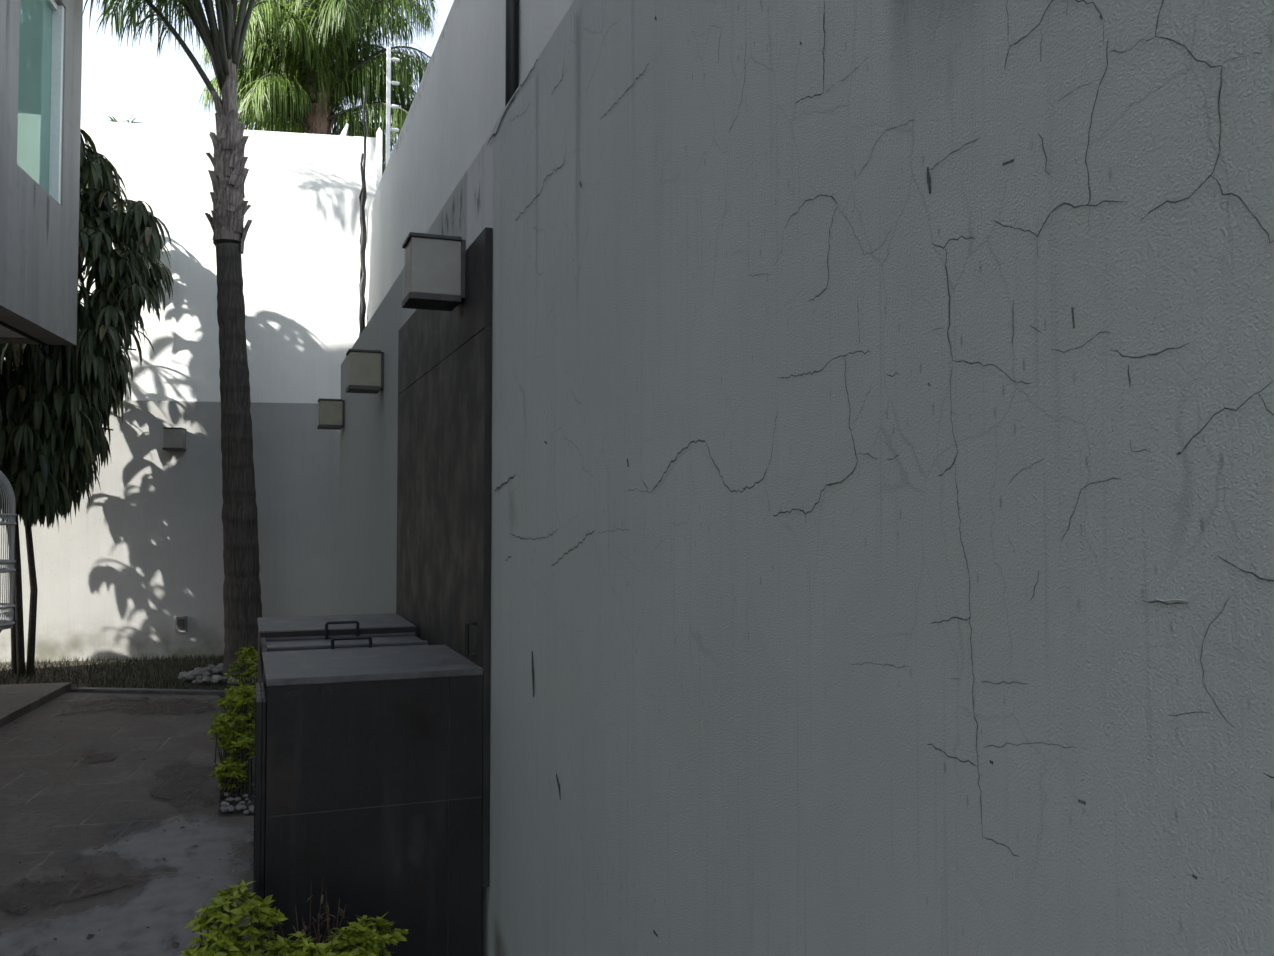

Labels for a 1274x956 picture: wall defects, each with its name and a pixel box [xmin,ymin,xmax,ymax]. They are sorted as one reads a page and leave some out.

crack [487,59,564,145]
crack [795,3,865,104]
crack [754,120,913,301]
crack [643,303,898,520]
crack [927,0,1274,857]
crack [508,529,622,567]